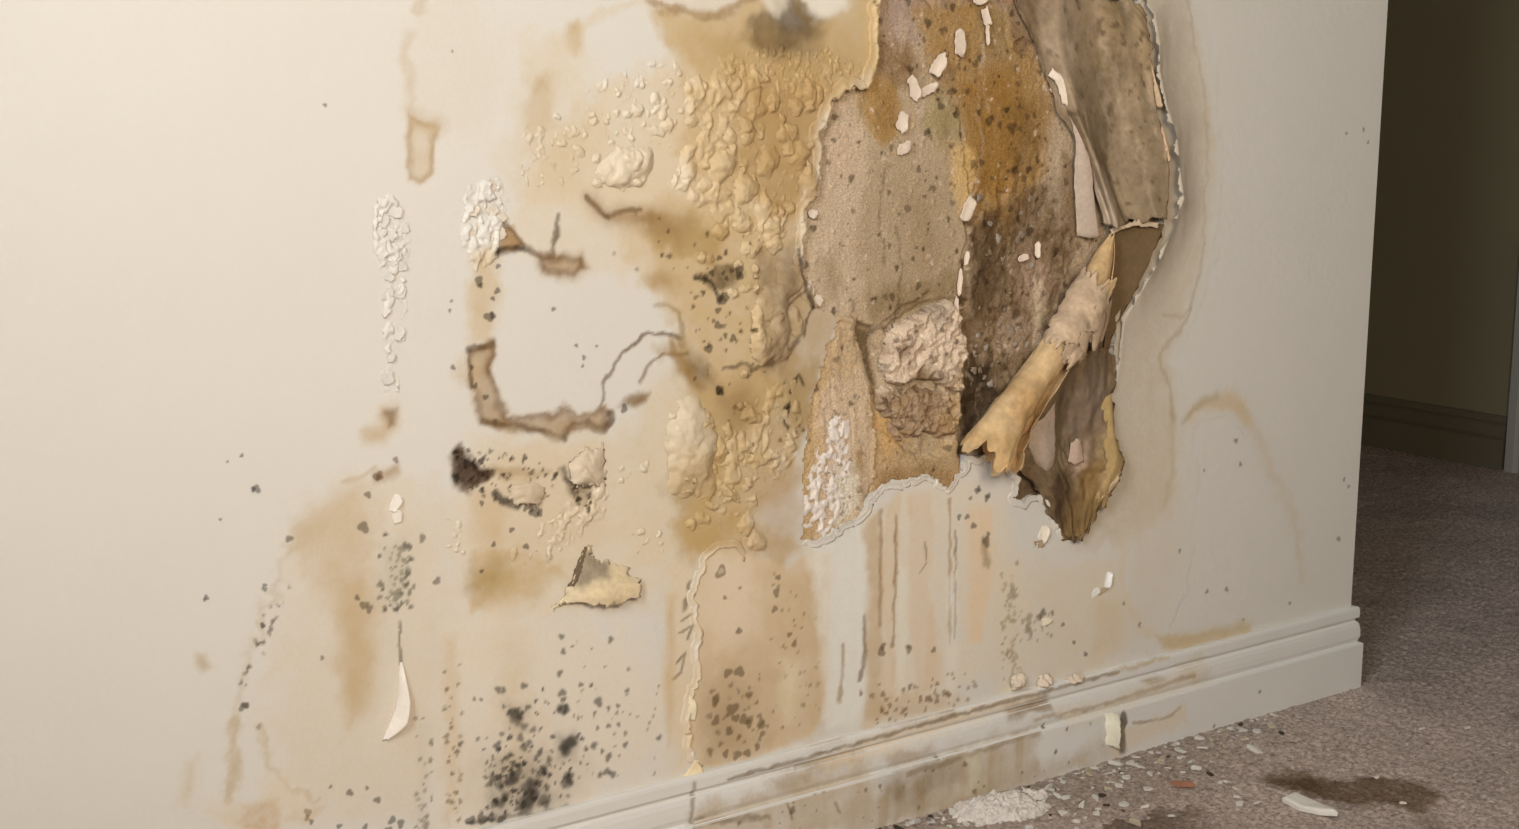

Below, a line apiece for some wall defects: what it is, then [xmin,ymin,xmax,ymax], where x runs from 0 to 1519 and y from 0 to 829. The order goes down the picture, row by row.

spalling [793,0,1159,548]
water stain [170,0,1311,829]
peeling [508,482,546,507]
peeling [568,441,607,489]
peeling [551,545,642,611]
peeling [383,619,411,741]
water stain [1252,765,1457,829]